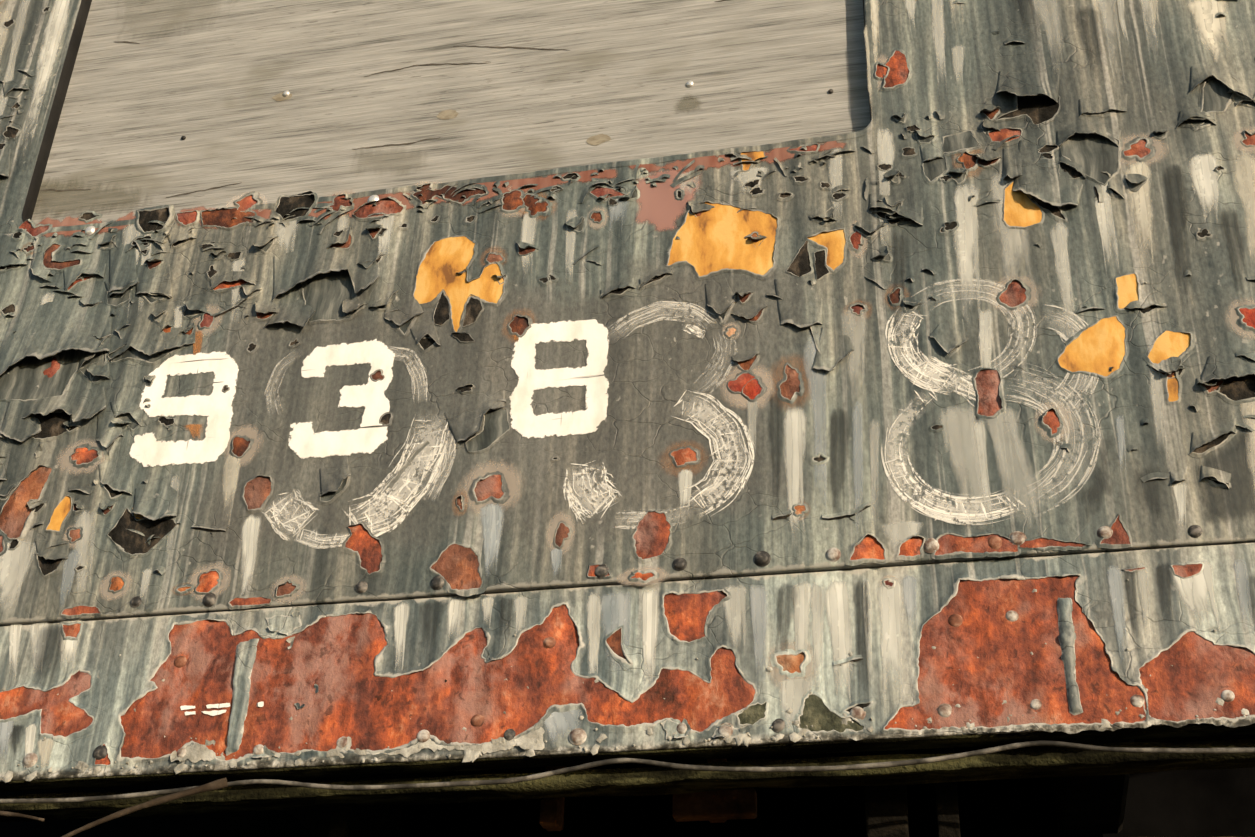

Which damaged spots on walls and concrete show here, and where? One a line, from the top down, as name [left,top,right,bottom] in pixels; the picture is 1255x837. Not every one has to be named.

peeling [0,19,17,38]
peeling [1153,62,1255,133]
peeling [0,67,1147,579]
corrosion [970,367,1007,420]
peeling [1055,272,1255,489]
corrosion [0,509,761,768]
corrosion [844,513,1255,735]